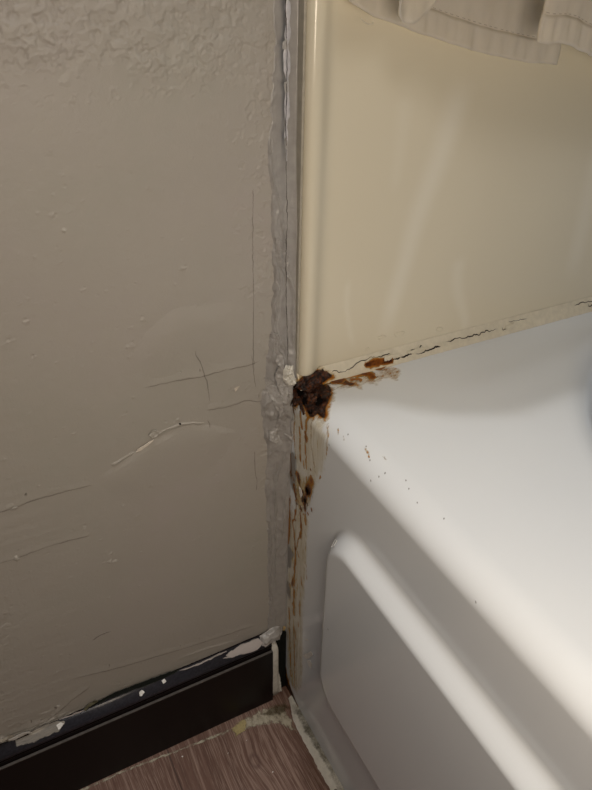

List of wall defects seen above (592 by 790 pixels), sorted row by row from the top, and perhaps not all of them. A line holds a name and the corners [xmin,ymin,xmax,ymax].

crack [282,174,290,359]
corrosion [329,358,398,387]
corrosion [285,406,321,706]